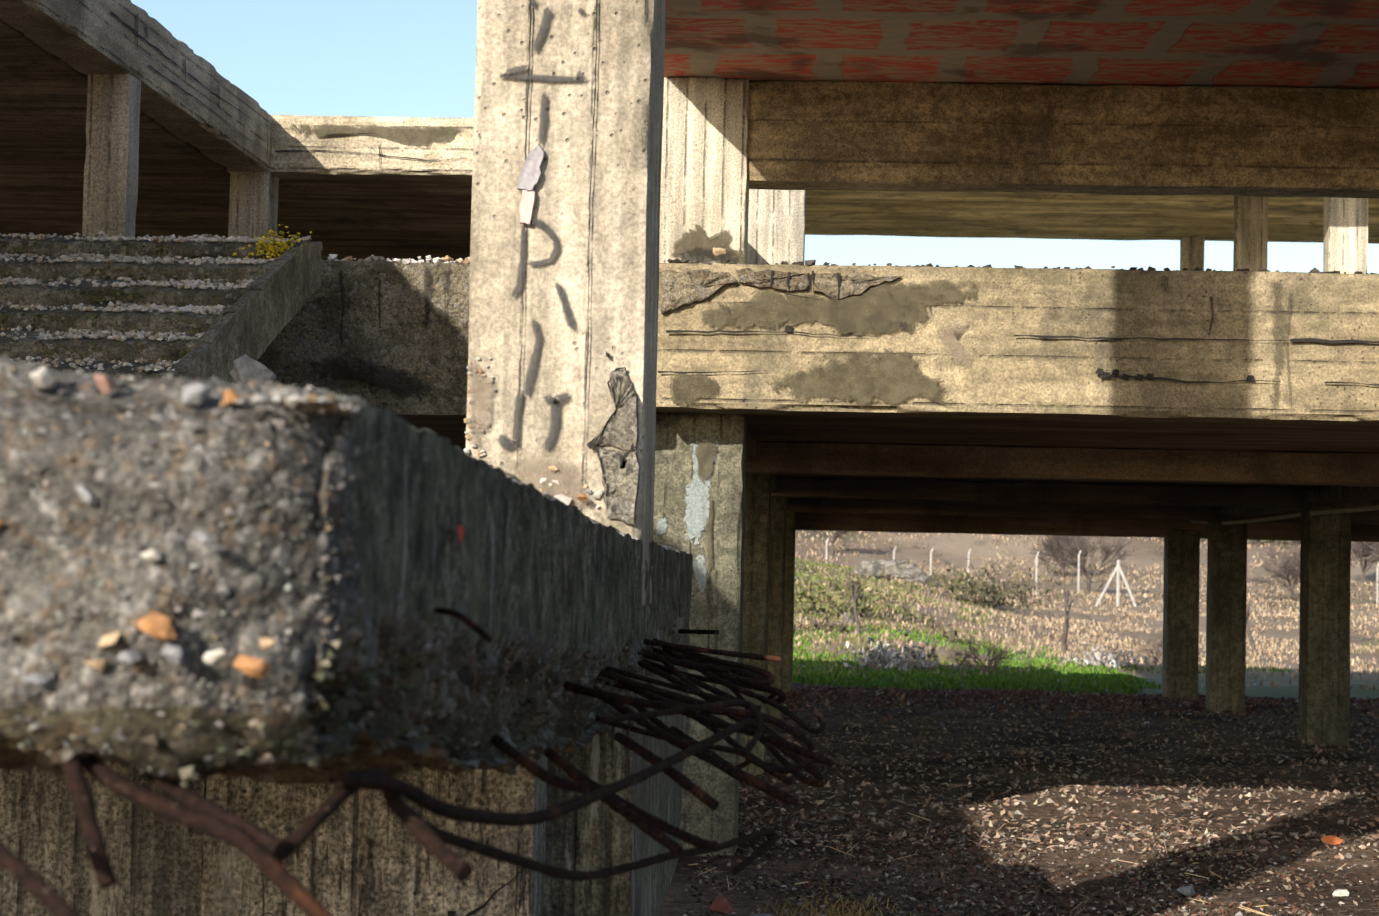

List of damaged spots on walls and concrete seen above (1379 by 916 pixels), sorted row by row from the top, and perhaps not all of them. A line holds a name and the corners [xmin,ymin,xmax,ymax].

water stain [671,225,745,264]
spalling [464,357,497,457]
spalling [509,351,641,525]
water stain [670,371,719,404]
water stain [702,279,977,406]
spalling [59,435,834,916]
crack [465,868,525,916]